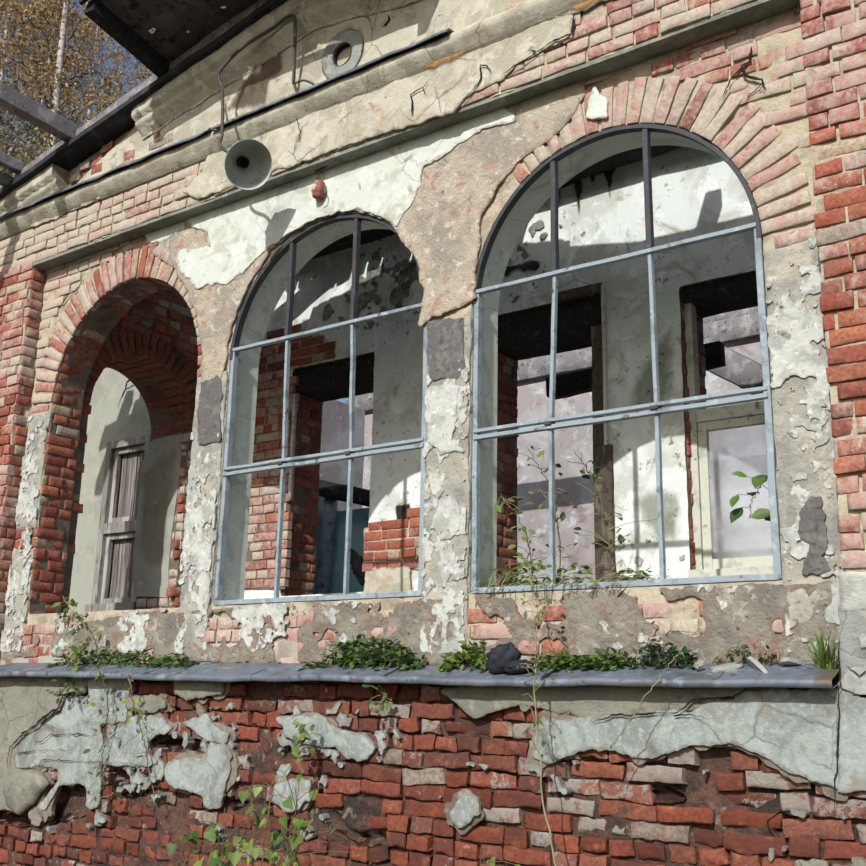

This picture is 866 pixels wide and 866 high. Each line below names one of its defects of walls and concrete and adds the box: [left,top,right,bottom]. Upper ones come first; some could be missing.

crack [410,71,437,114]
flaking render [253,0,612,174]
crack [463,13,575,100]
crack [722,47,766,114]
peeling [0,415,47,658]
flaking render [0,677,404,848]
crack [593,688,746,723]
crack [832,637,866,827]
flaking render [439,788,486,835]
flaking render [767,808,810,862]
flaking render [795,856,866,866]